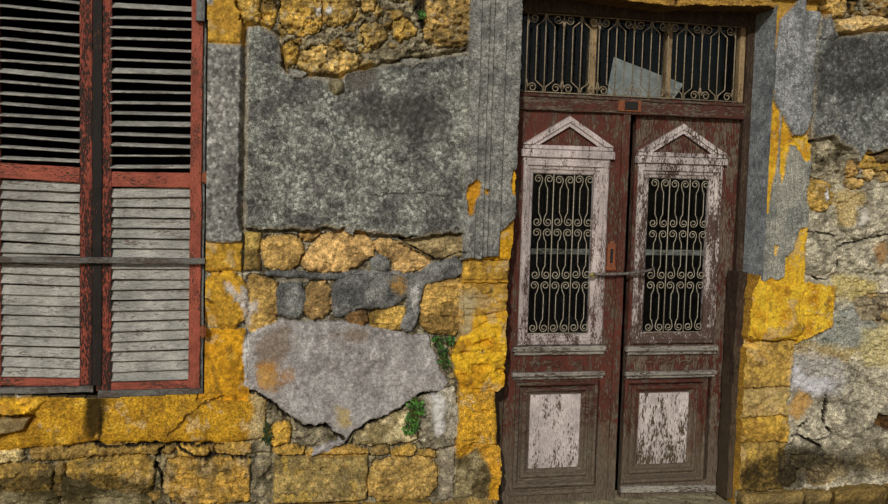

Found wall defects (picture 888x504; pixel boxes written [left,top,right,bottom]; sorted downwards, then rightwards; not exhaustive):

spalling [236,0,472,80]
spalling [771,0,888,56]
spalling [767,91,888,214]
peeling [466,180,490,217]
spalling [241,217,514,341]
peeling [759,227,808,281]
crack [64,396,256,488]
spalling [249,375,505,504]
crack [789,388,834,452]